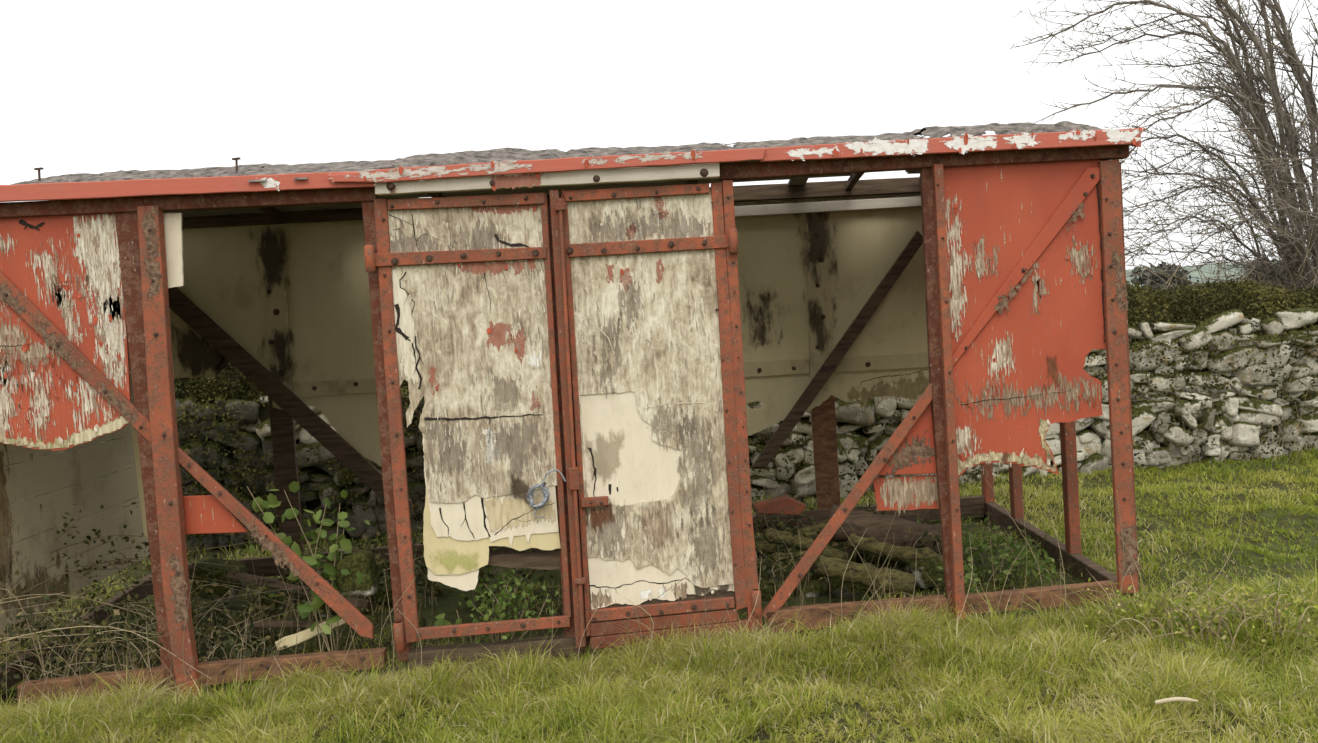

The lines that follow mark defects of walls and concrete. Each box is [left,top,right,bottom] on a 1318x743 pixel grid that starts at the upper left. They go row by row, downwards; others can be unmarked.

peeling [582,149,703,168]
peeling [786,132,1040,161]
peeling [1058,126,1144,145]
peeling [945,195,1004,343]
peeling [995,262,1049,314]
peeling [1061,203,1129,311]
peeling [0,213,144,449]
peeling [393,266,420,385]
peeling [987,331,1016,381]
peeling [956,422,979,460]
peeling [635,499,700,555]